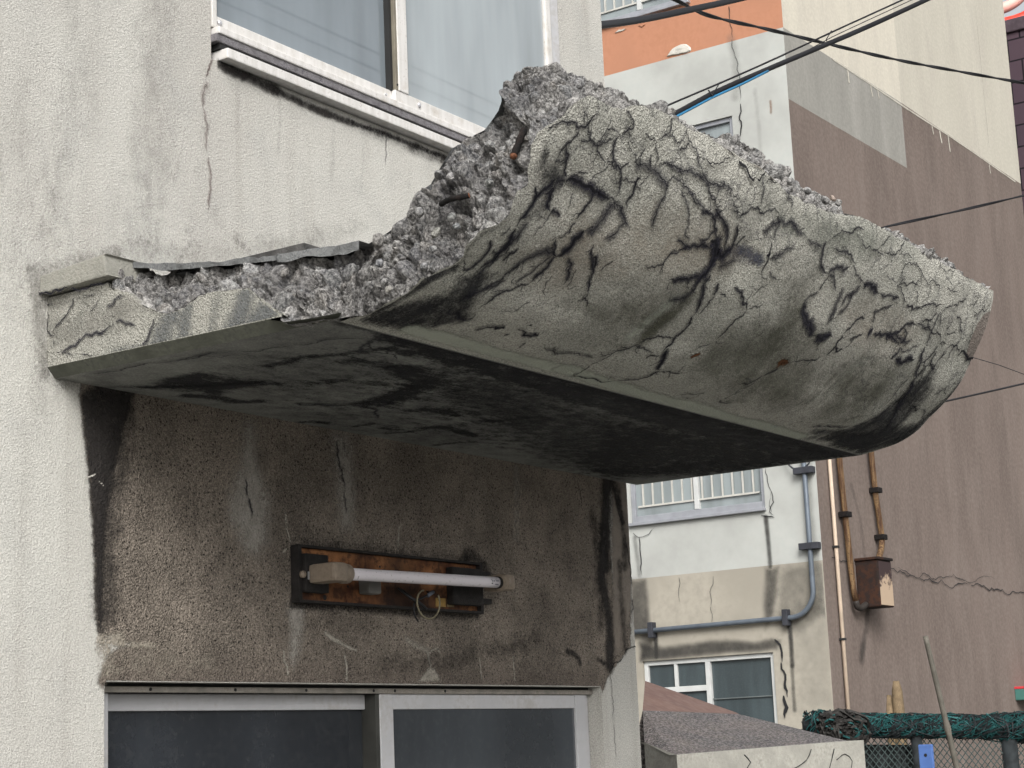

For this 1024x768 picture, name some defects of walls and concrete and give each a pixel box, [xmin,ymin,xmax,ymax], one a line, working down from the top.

spalling [112,62,855,329]
crack [434,8,989,434]
spalling [885,227,991,289]
crack [39,283,269,374]
water stain [79,265,960,691]
crack [761,469,774,517]
crack [891,567,1024,595]
crack [774,639,788,718]